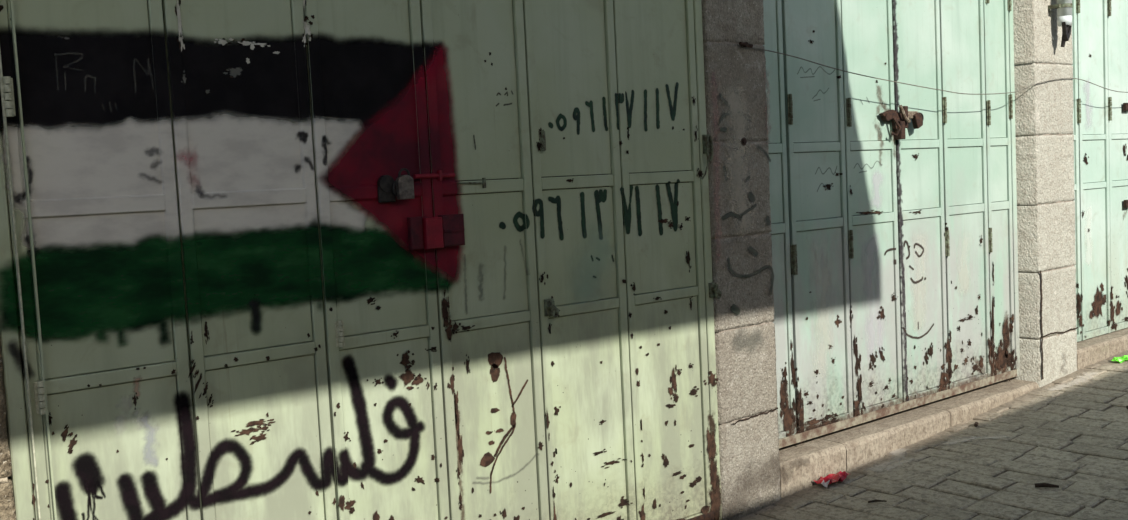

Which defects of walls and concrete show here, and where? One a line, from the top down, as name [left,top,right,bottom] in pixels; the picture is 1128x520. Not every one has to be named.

rust [480,352,528,493]
rust [708,414,720,512]
rust [781,383,842,436]